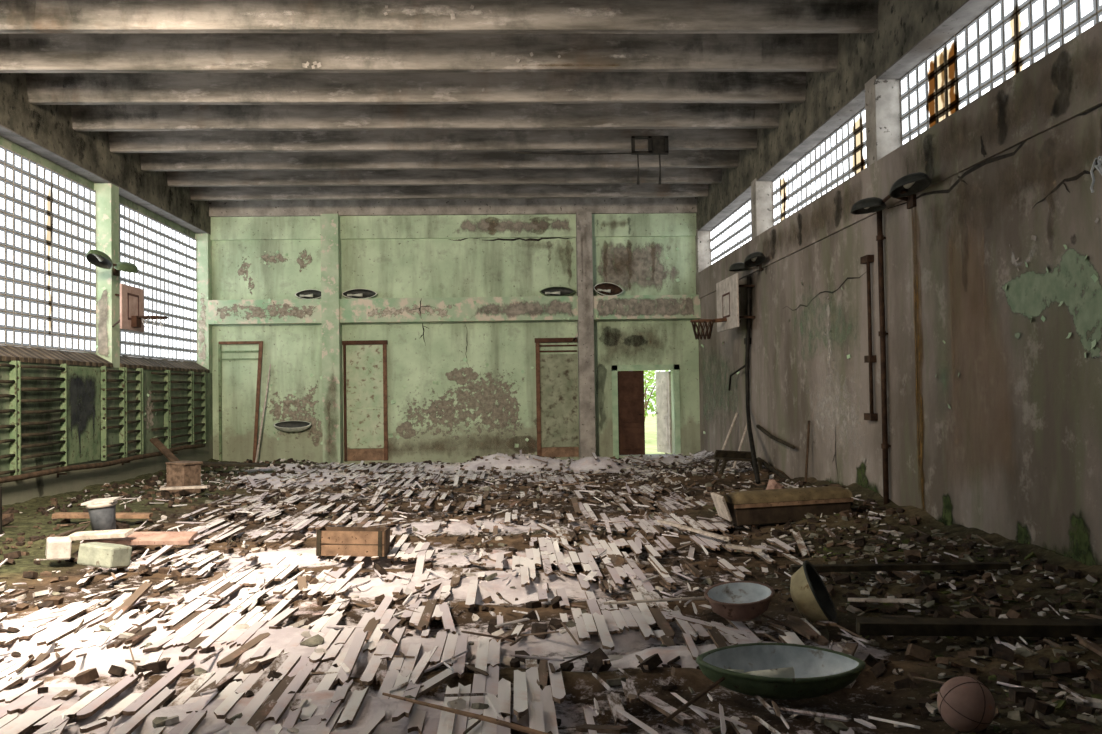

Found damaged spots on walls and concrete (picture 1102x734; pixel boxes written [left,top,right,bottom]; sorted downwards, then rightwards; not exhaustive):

corrosion [926,41,960,128]
peeling [196,250,320,361]
peeling [359,297,574,321]
peeling [593,236,696,318]
peeling [1002,235,1102,362]
peeling [388,357,534,448]